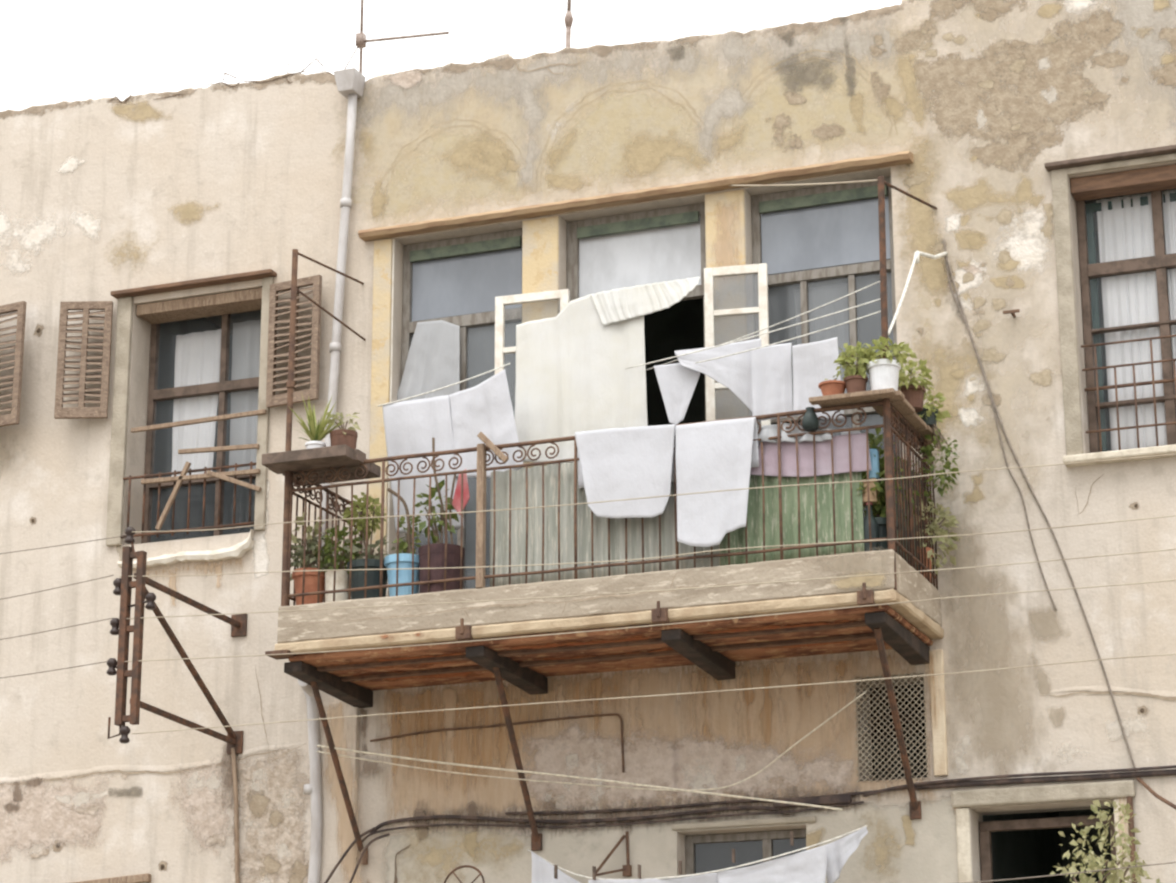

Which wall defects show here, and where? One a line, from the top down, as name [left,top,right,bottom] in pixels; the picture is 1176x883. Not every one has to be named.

damp [113,101,160,121]
peeling [774,92,844,148]
flaking render [870,0,1176,362]
damp [174,203,203,223]
peeling [934,370,1001,431]
peeling [1030,369,1052,386]
flaking render [0,774,141,861]